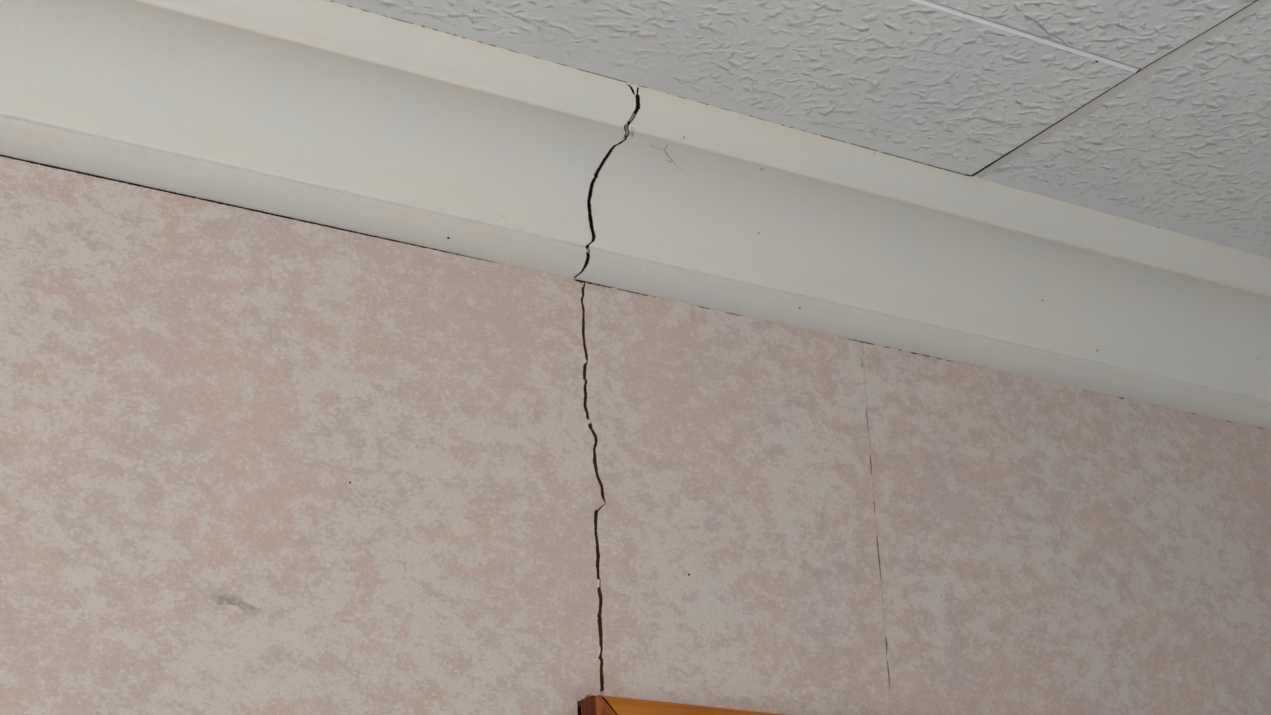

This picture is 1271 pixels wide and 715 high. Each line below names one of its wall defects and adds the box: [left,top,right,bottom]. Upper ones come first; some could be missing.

crack [330,0,1258,715]